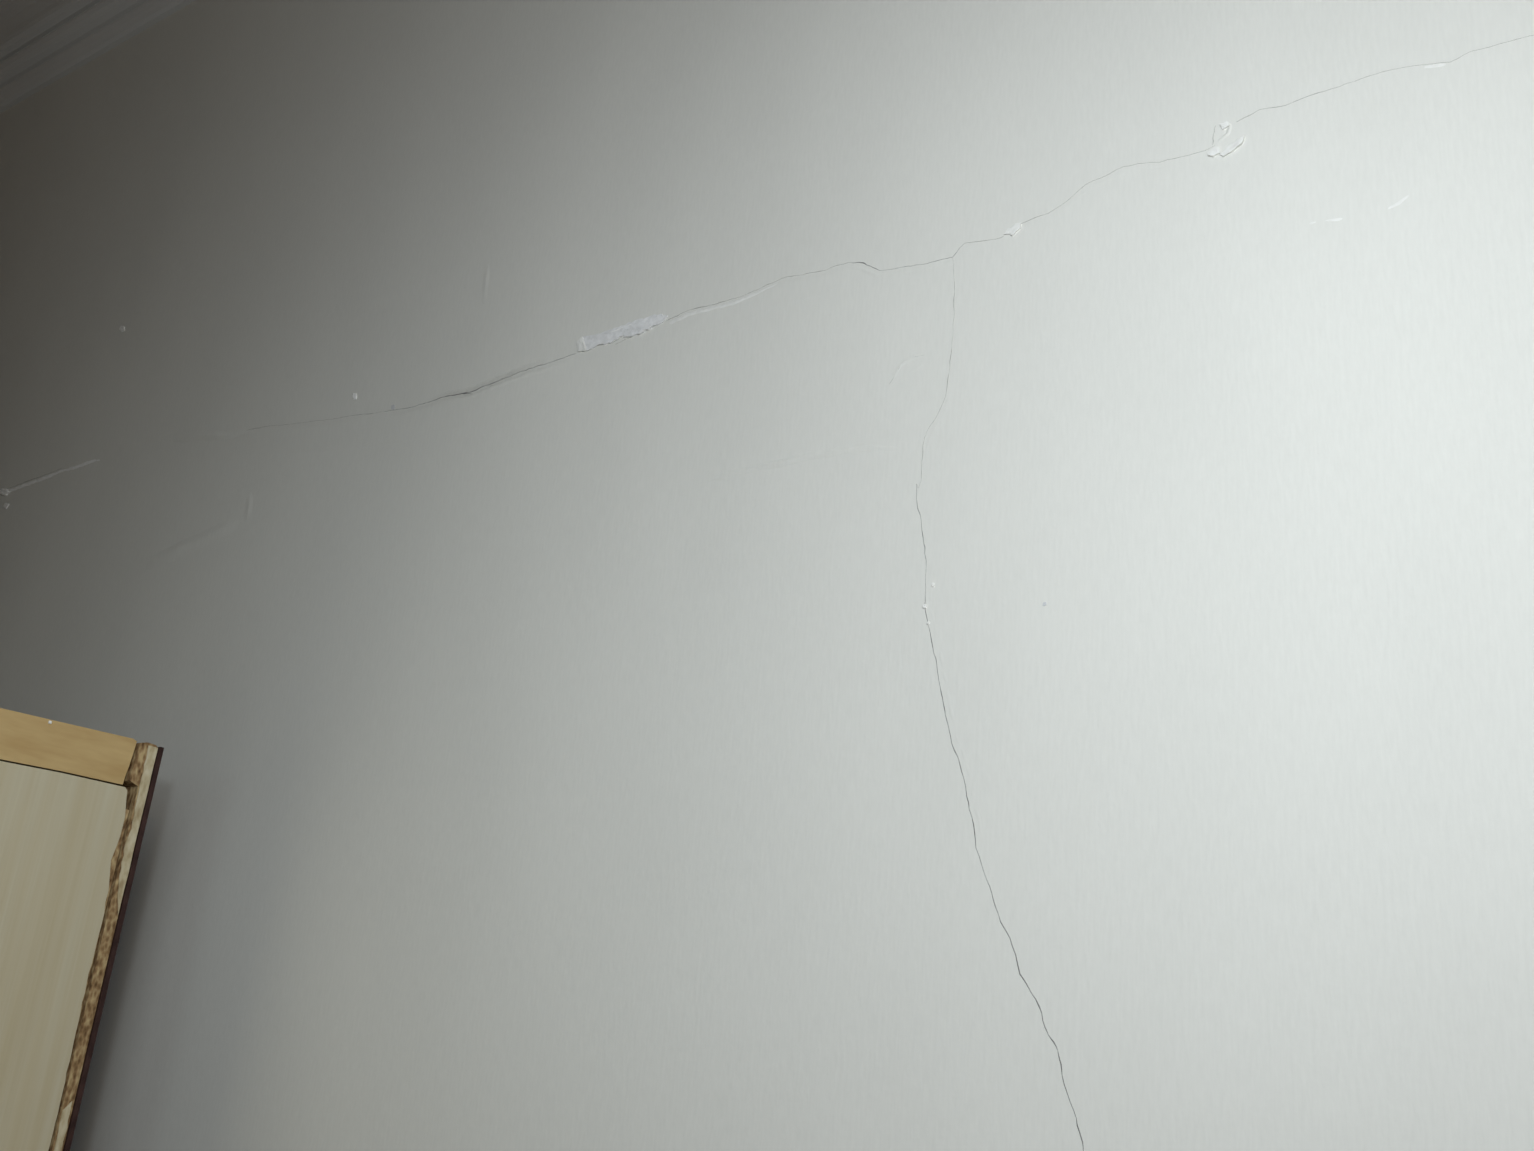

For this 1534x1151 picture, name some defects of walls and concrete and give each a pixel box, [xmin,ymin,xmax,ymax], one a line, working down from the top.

crack [916,263,1092,1151]